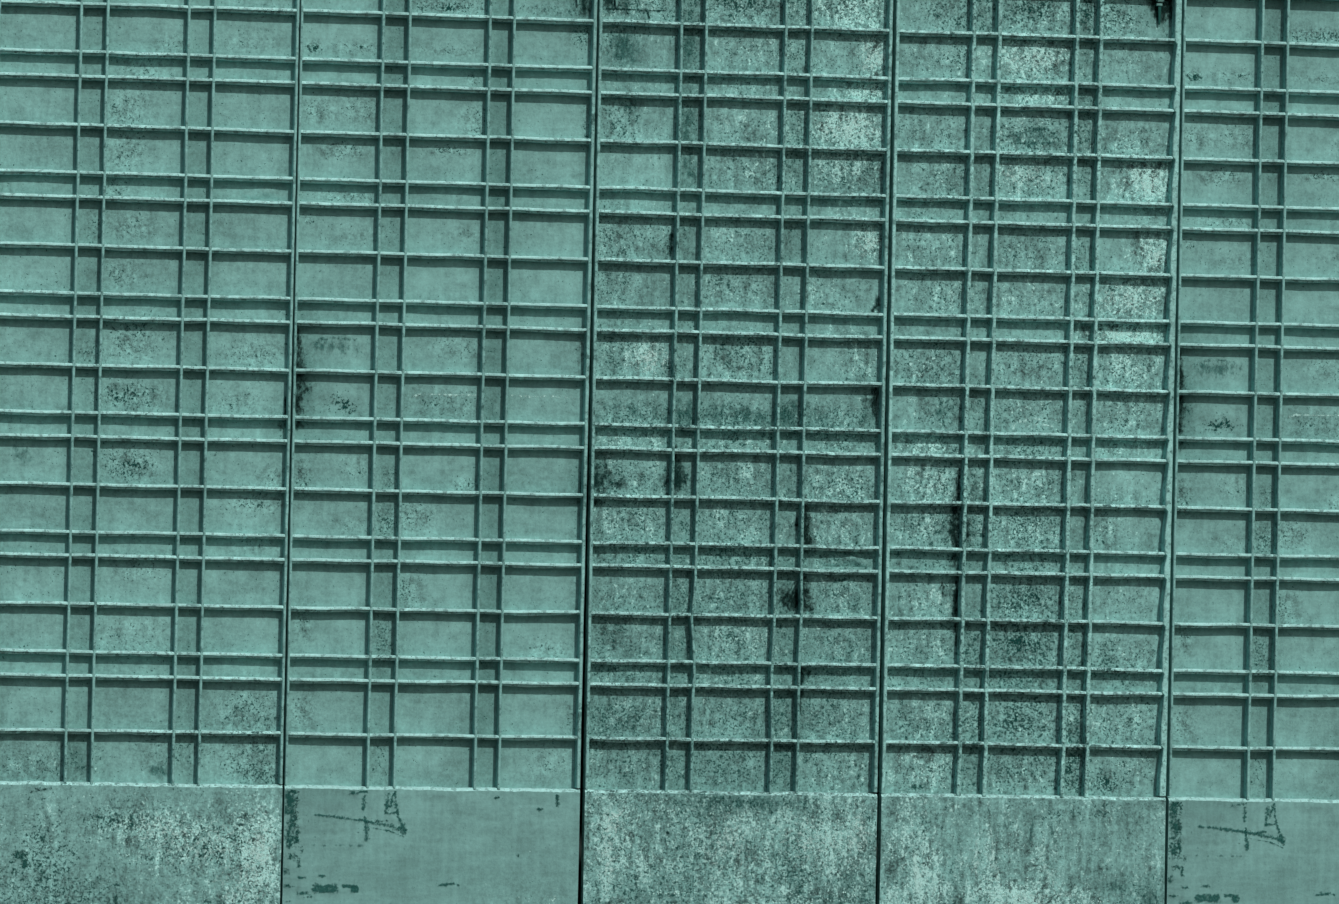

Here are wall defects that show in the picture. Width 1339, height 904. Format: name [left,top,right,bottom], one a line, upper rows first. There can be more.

peeling [92,789,359,904]
peeling [1168,801,1240,904]